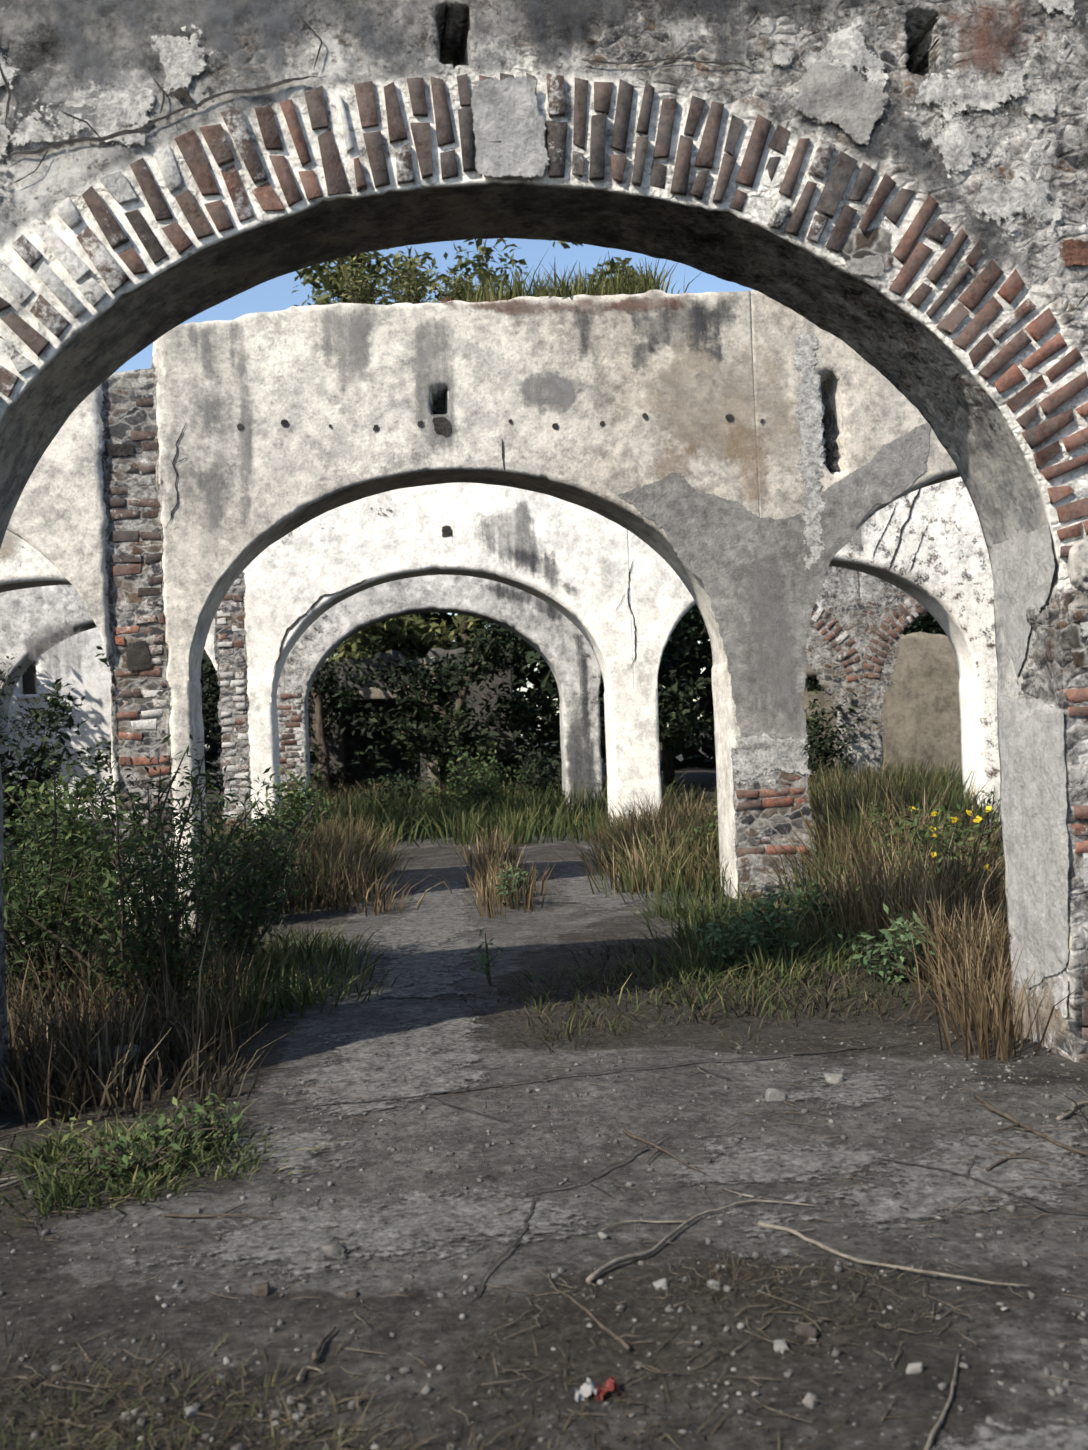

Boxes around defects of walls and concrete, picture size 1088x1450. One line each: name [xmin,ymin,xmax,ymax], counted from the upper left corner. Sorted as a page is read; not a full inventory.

peeling [0,24,220,201]
crack [0,11,326,183]
leakage [520,0,608,66]
peeling [772,26,889,100]
peeling [1038,0,1088,55]
peeling [909,64,1088,266]
crack [167,423,186,525]
leakage [481,501,575,592]
leakage [489,583,561,621]
peeling [998,695,1088,1018]